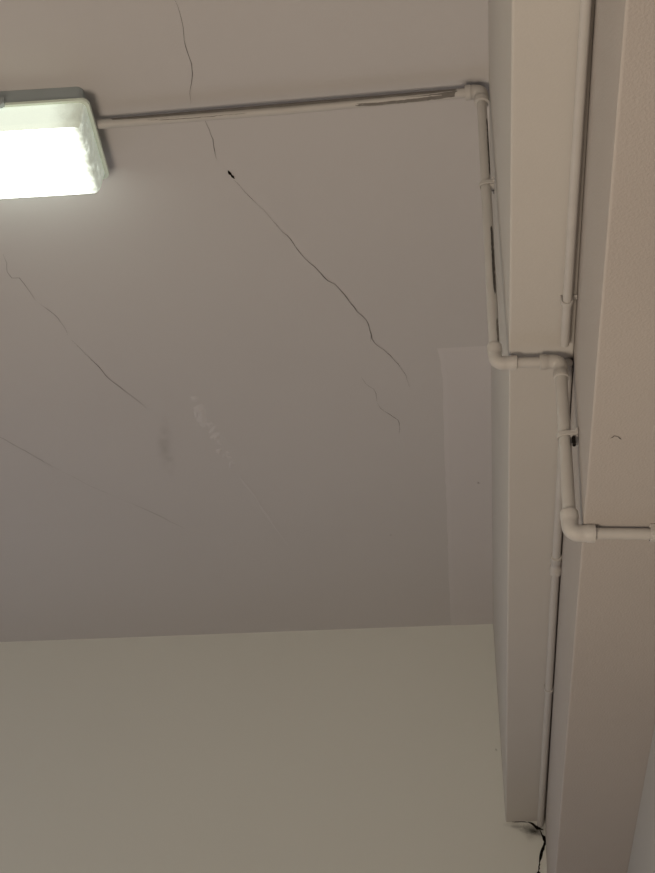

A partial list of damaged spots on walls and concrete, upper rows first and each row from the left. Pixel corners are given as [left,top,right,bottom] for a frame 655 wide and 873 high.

crack [235,181,410,387]
crack [520,821,546,873]